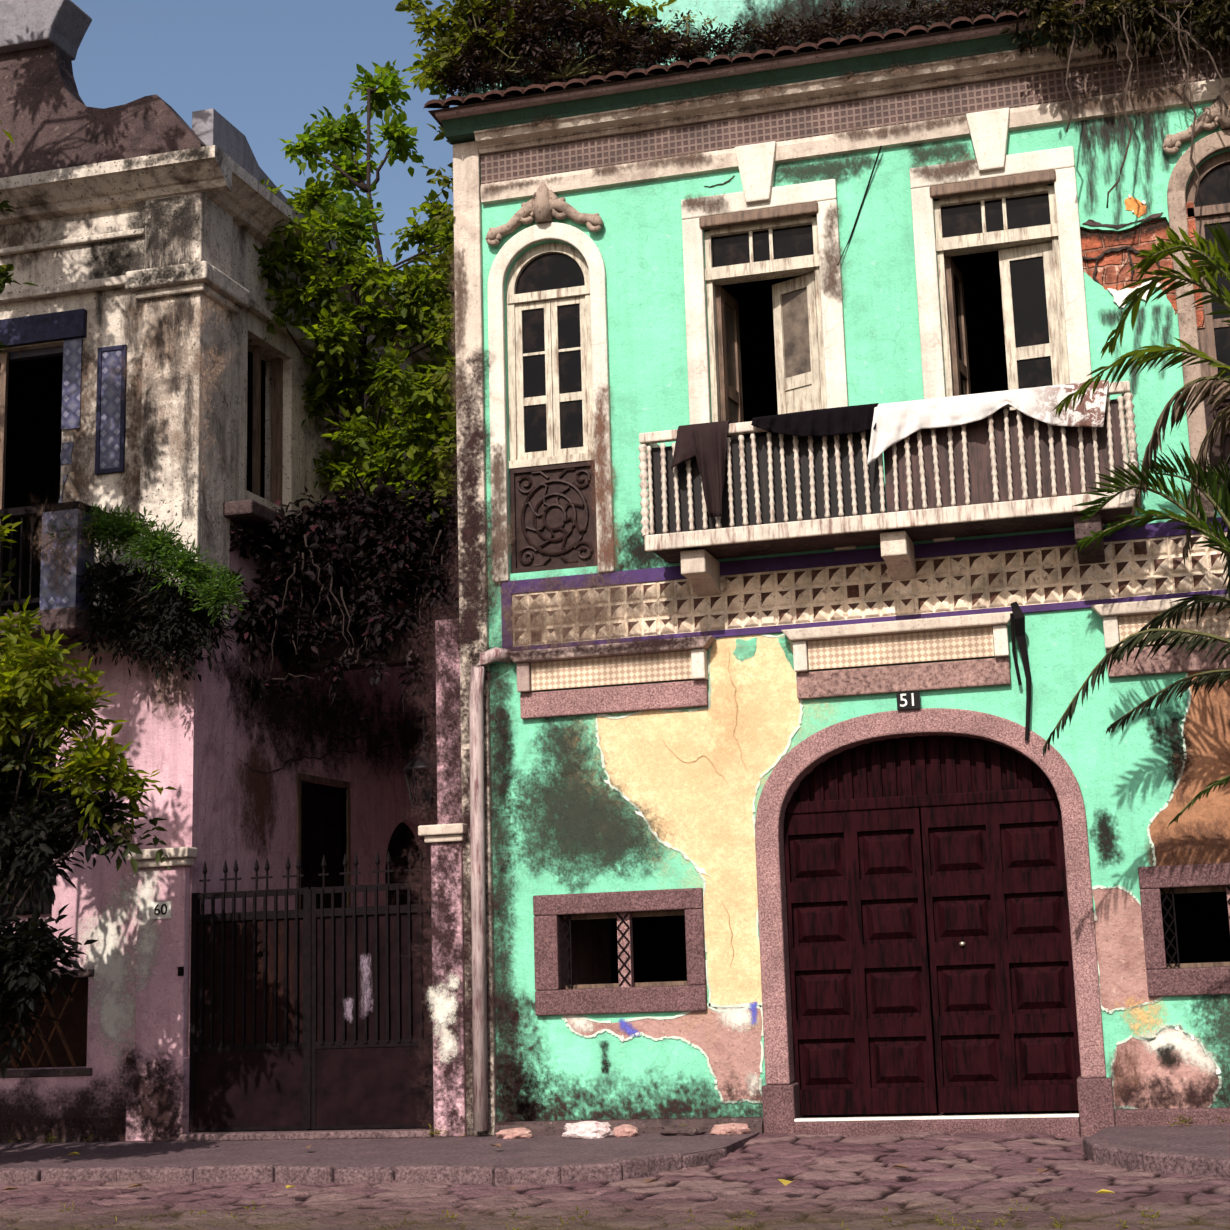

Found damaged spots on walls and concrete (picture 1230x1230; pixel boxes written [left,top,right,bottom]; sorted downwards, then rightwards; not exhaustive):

water stain [729,0,1032,64]
water stain [1080,112,1169,227]
spalling [1080,194,1177,315]
spalling [1186,201,1199,267]
spalling [1193,284,1205,329]
water stain [118,292,222,518]
water stain [209,250,763,1137]
peeling [1147,671,1230,866]
peeling [561,634,803,1104]
water stain [1090,811,1123,865]
water stain [0,1048,192,1143]
spalling [1108,1025,1230,1111]